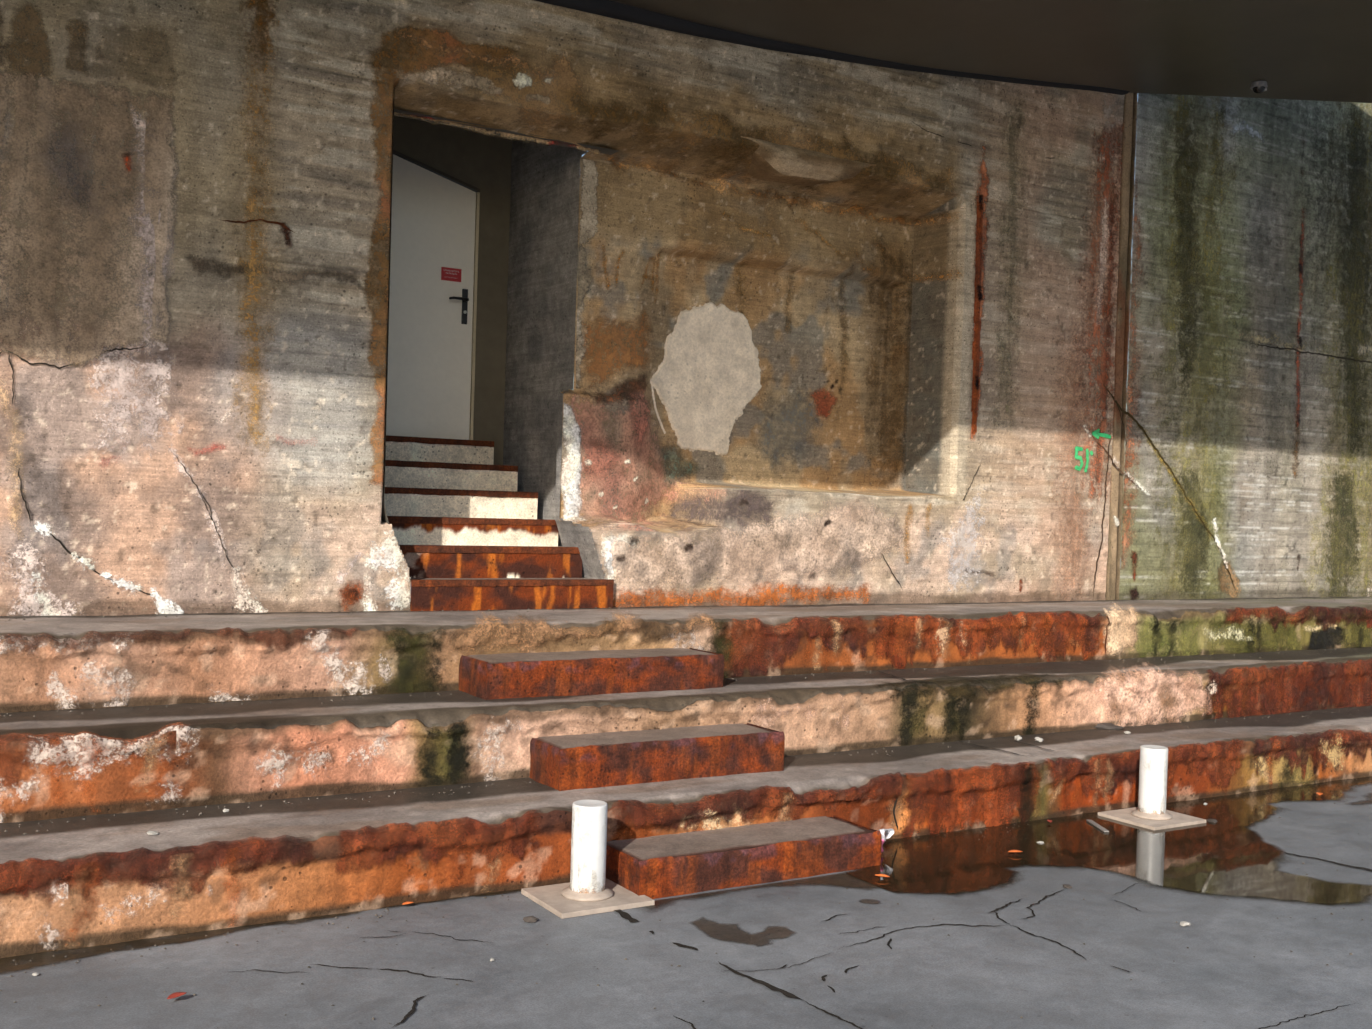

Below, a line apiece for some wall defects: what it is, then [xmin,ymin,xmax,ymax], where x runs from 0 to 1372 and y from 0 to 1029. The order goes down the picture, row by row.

damp [364,26,953,484]
rust [970,146,990,438]
crack [0,340,168,405]
spalling [571,375,904,587]
damp [11,539,77,616]
crack [18,467,183,614]
damp [1326,472,1359,597]
rust [613,584,1102,677]
damp [31,726,188,779]
rust [1167,729,1372,792]
rust [0,835,312,915]
crack [716,889,1130,992]